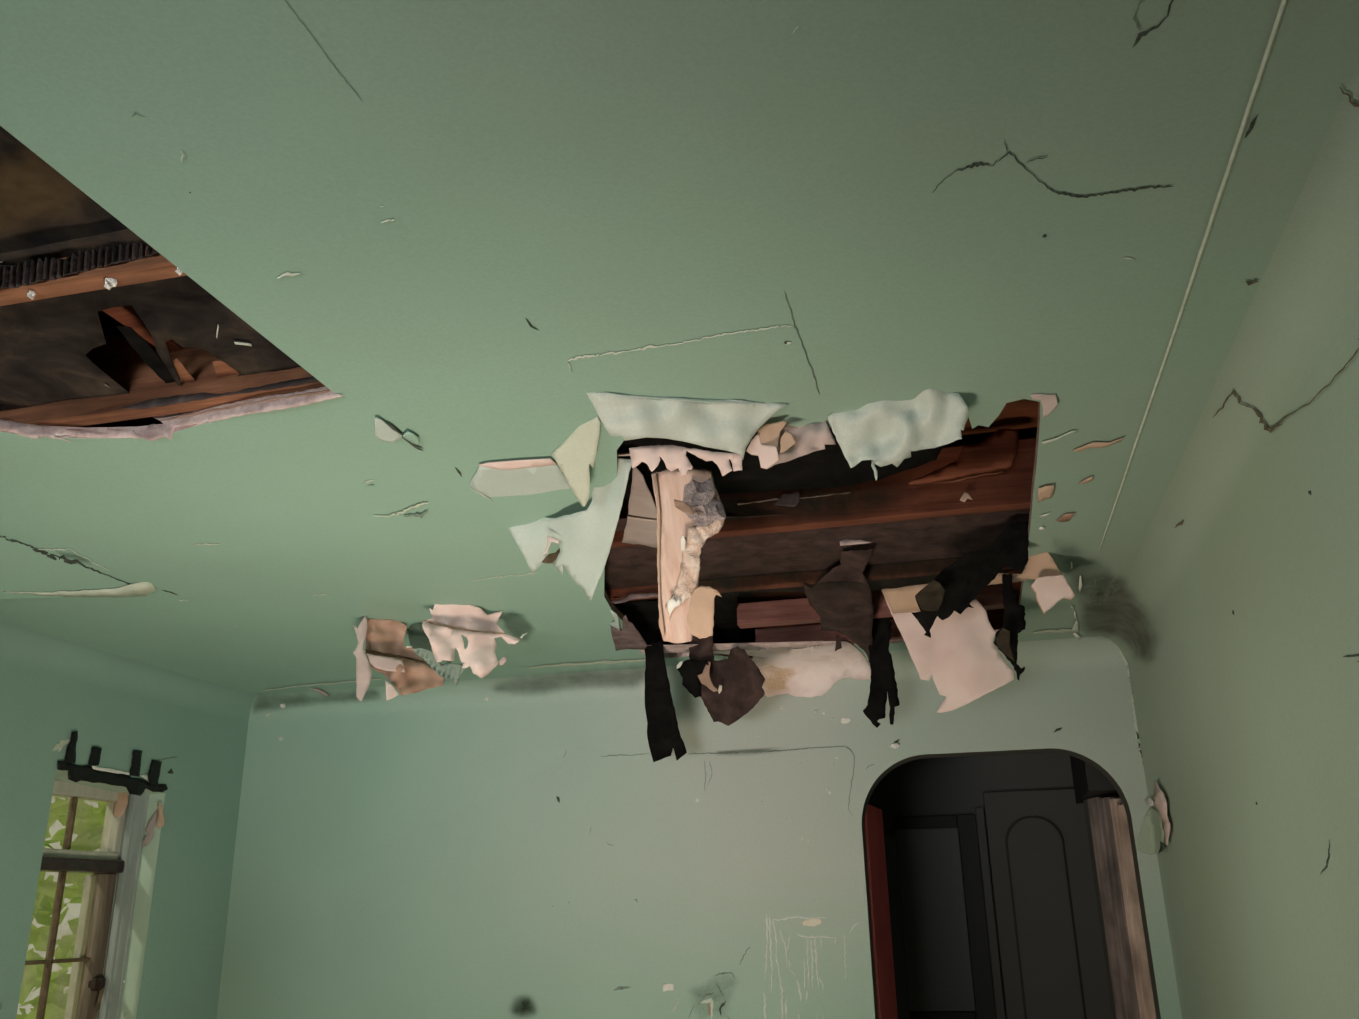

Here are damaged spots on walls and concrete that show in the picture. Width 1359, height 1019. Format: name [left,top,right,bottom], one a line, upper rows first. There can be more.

crack [1132,0,1173,48]
spalling [0,387,344,442]
peeling [1030,394,1058,419]
peeling [1042,431,1124,452]
peeling [469,388,969,600]
peeling [1038,485,1075,530]
crack [0,536,189,601]
peeling [988,552,1082,640]
peeling [353,604,528,701]
spalling [610,610,871,698]
peeling [881,584,1014,713]
peeling [689,947,750,1019]